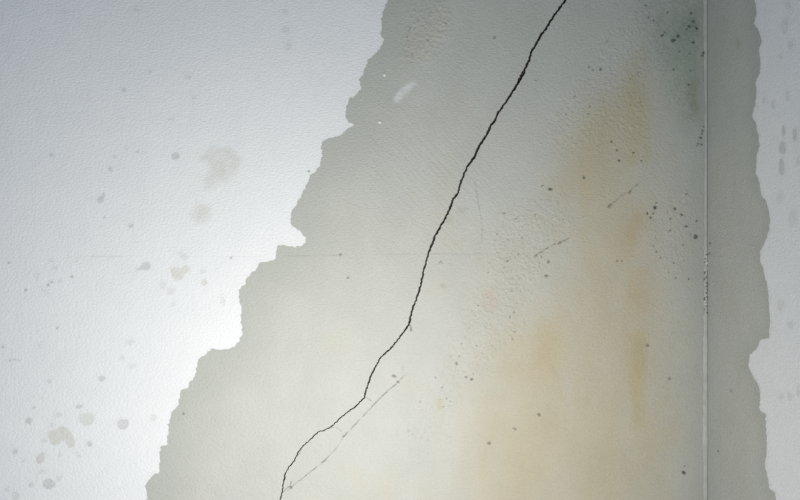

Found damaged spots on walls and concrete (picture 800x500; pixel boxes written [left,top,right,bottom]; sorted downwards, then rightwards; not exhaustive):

crack [280,0,566,500]
damp [144,0,777,500]